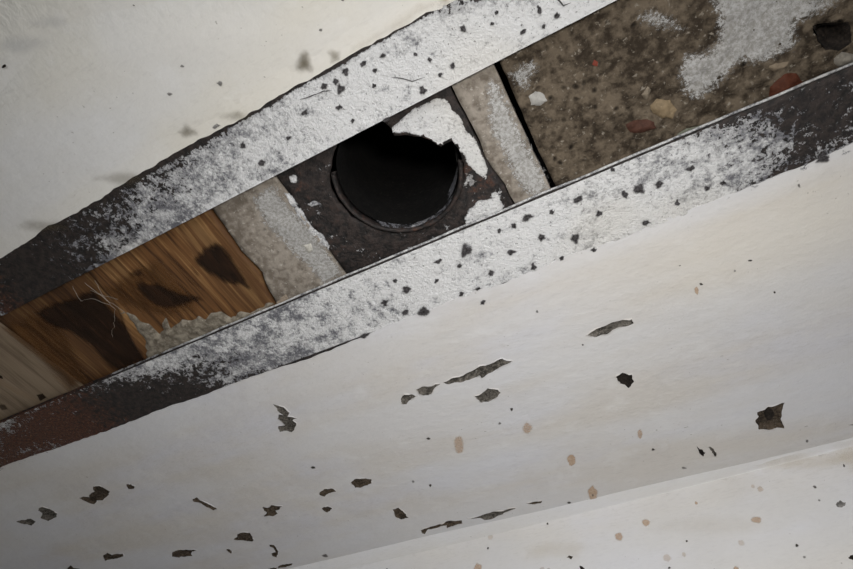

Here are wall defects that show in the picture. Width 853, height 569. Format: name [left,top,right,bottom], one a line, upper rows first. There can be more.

spalling [813,22,851,51]
peeling [31,0,616,279]
peeling [0,81,853,471]
spalling [80,485,110,505]
spalling [263,505,283,517]
spalling [319,488,336,513]
spalling [350,478,373,488]
spalling [393,508,408,519]
spalling [421,507,516,534]
spalling [234,531,255,542]
spalling [172,549,198,558]
spalling [269,544,293,569]